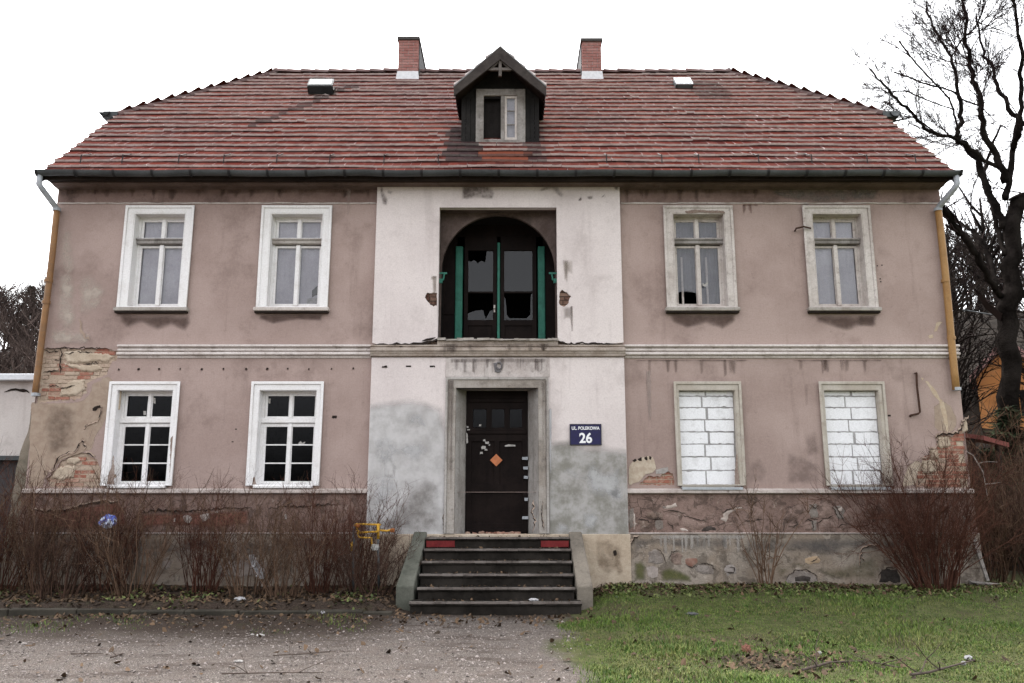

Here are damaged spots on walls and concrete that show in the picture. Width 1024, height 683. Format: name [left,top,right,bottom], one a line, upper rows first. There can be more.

spalling [425,293,437,307]
spalling [559,290,571,307]
flaking render [28,348,122,488]
crack [44,405,102,474]
spalling [903,377,968,488]
flaking render [628,456,674,486]
peeling [702,506,742,531]
spalling [669,550,736,577]
spalling [786,556,821,583]
spalling [878,567,900,583]